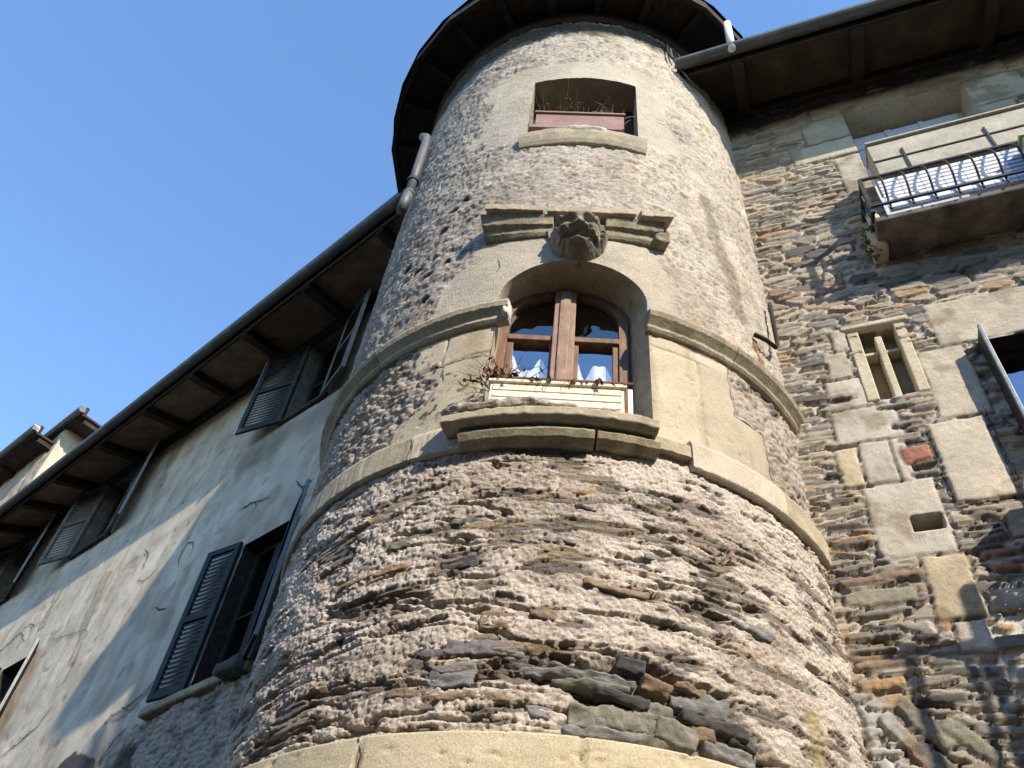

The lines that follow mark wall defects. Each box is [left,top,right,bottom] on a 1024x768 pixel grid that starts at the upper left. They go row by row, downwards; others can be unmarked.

crack [120,540,193,582]